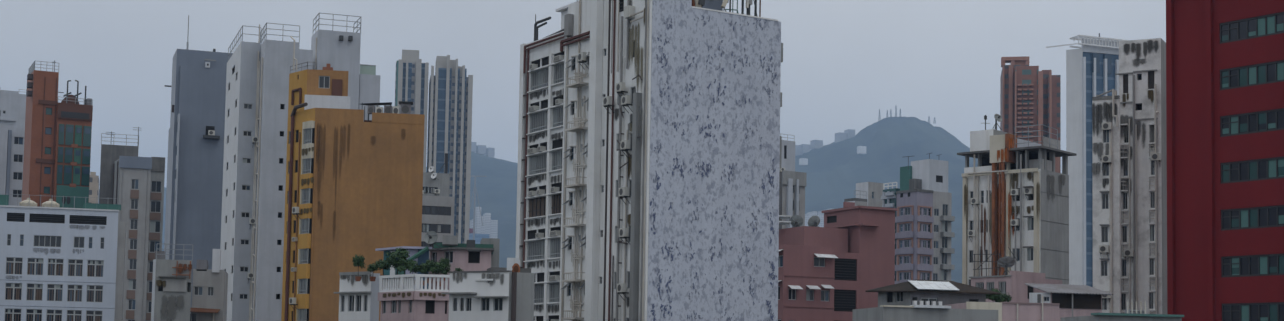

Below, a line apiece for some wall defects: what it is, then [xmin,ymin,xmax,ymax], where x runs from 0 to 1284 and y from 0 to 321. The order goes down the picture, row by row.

rust [997,138,1012,163]
rust [984,184,1017,256]